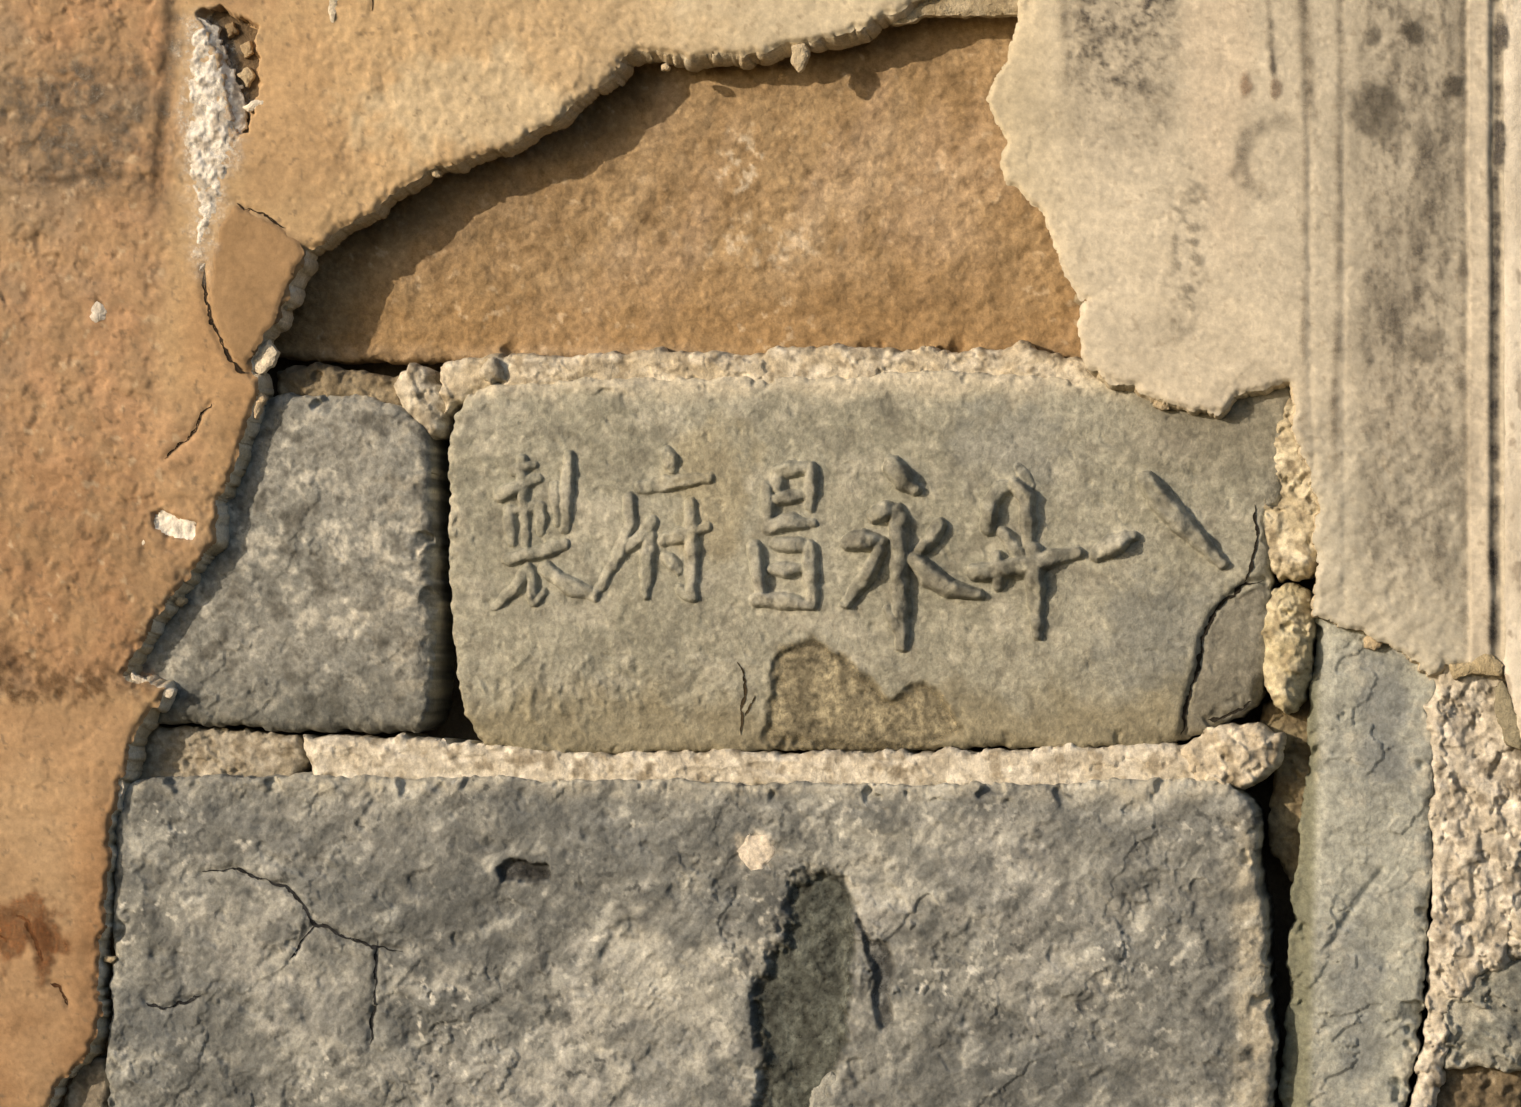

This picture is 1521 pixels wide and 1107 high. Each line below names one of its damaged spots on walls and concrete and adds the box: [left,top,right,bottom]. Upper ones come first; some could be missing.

leakage [1077,0,1169,92]
leakage [1371,0,1465,44]
leakage [1365,52,1466,275]
leakage [1367,271,1424,357]
flaking render [1083,361,1310,468]
flaking render [48,0,1019,1107]
crack [1180,504,1262,735]
flaking render [1310,488,1521,750]
crack [146,995,201,1010]
crack [202,867,397,1045]